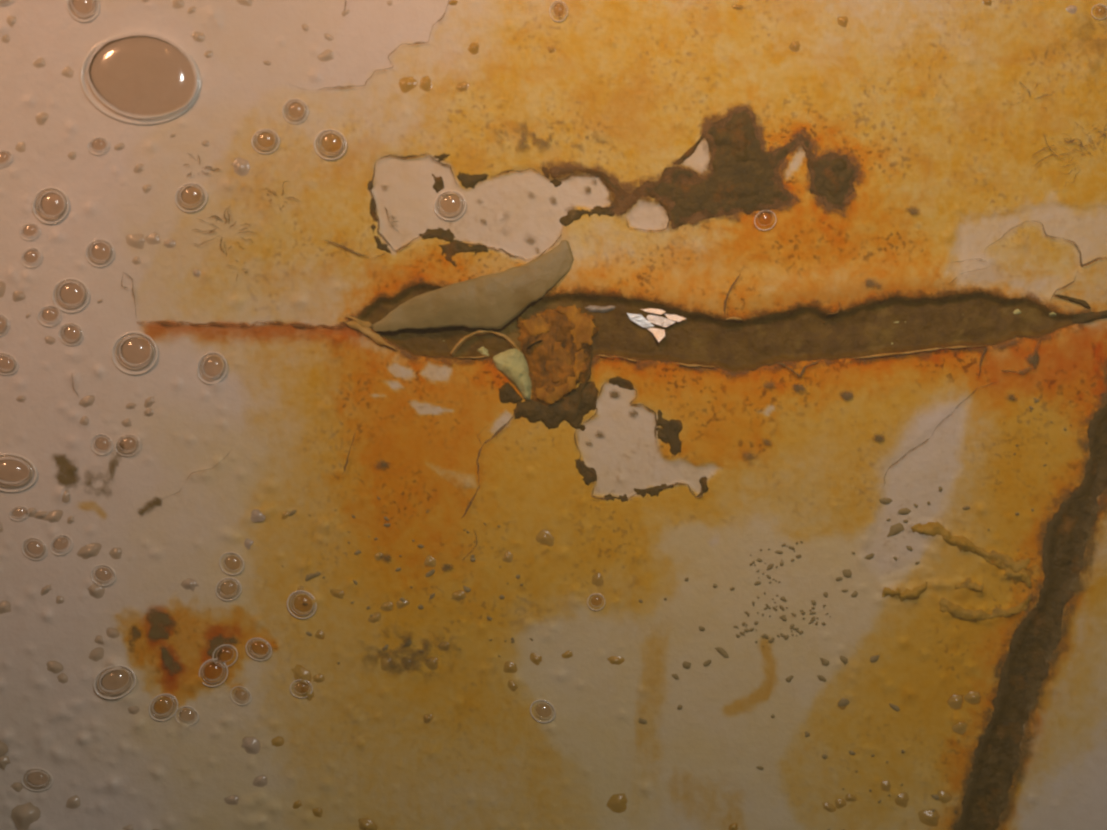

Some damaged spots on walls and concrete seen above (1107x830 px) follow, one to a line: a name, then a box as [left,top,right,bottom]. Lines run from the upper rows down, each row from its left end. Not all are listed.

peeling [367,153,671,267]
rust [544,105,862,229]
rust [755,279,1008,318]
peeling [450,330,532,404]
rust [513,288,749,429]
peeling [574,376,723,502]
rust [139,498,161,515]
rust [130,610,181,673]